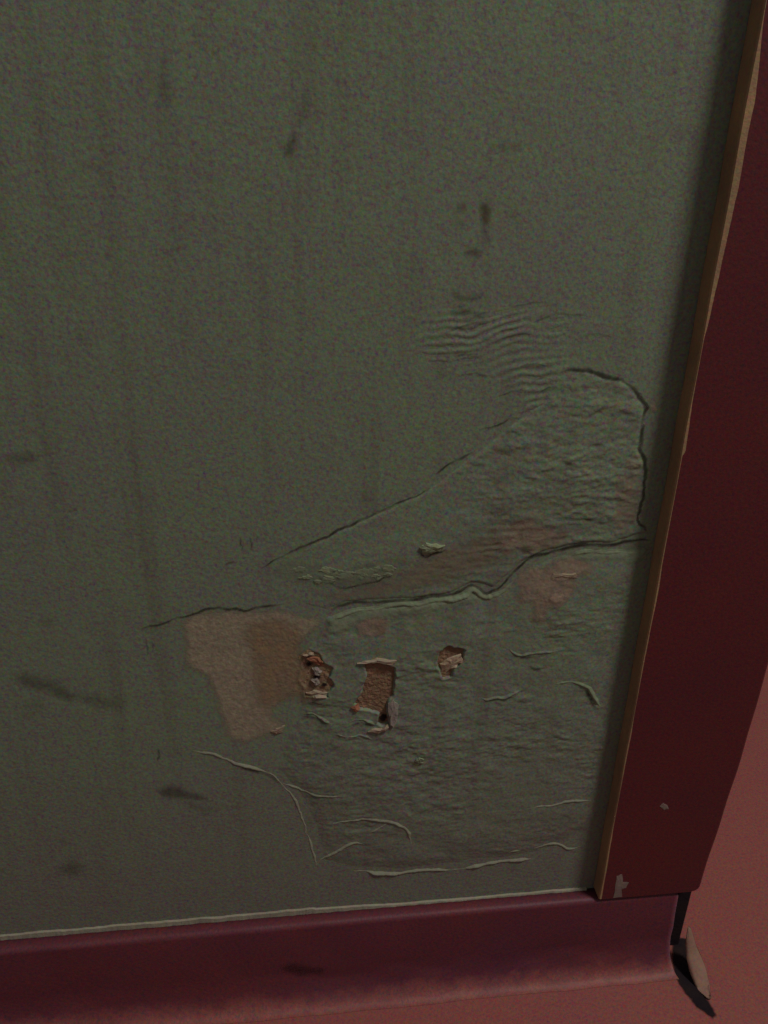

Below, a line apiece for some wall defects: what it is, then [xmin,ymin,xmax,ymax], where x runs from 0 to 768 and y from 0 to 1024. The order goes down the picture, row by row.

crack [328,368,649,633]
crack [299,521,358,548]
crack [152,605,272,626]
peeling [184,611,333,741]
flaking render [437,646,464,677]
flaking render [351,658,399,734]
peeling [613,874,629,898]